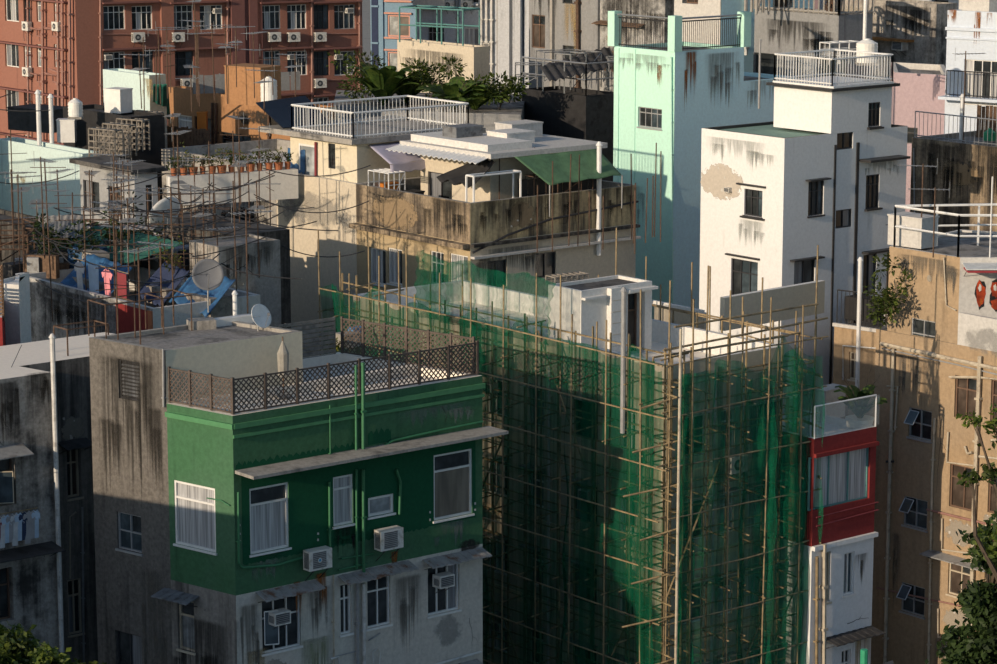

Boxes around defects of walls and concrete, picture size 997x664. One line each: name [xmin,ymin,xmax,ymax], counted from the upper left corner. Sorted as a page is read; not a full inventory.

rust [684,52,696,104]
damp [930,145,997,203]
damp [424,200,463,232]
damp [902,257,956,289]
damp [103,359,161,477]